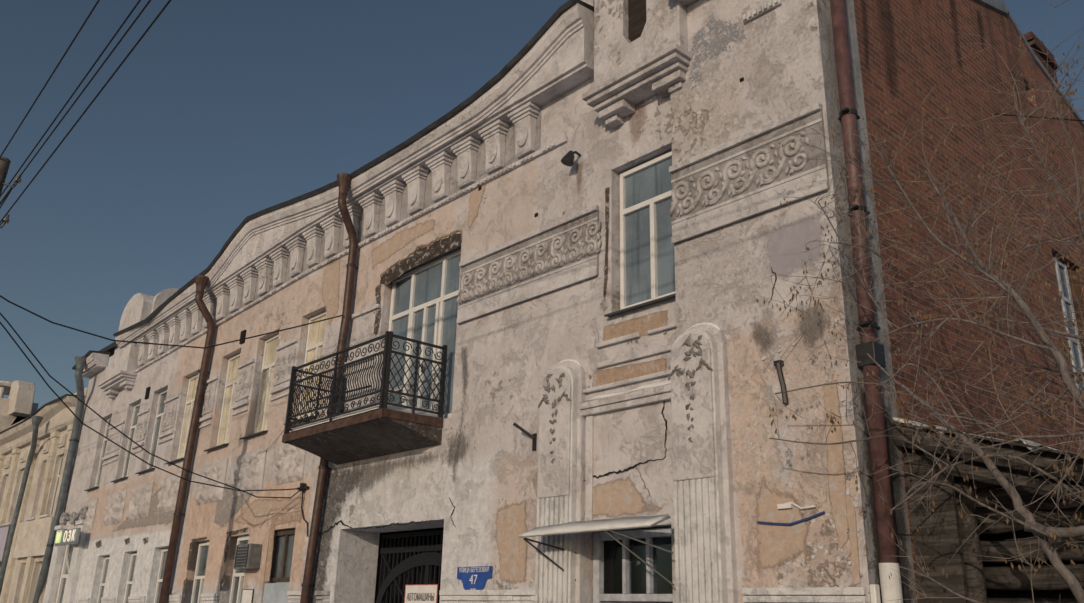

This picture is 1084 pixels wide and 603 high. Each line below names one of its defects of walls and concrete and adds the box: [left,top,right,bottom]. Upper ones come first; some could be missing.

crack [584,401,667,495]
peeling [493,470,538,583]
peeling [584,477,660,518]
peeling [756,478,818,571]